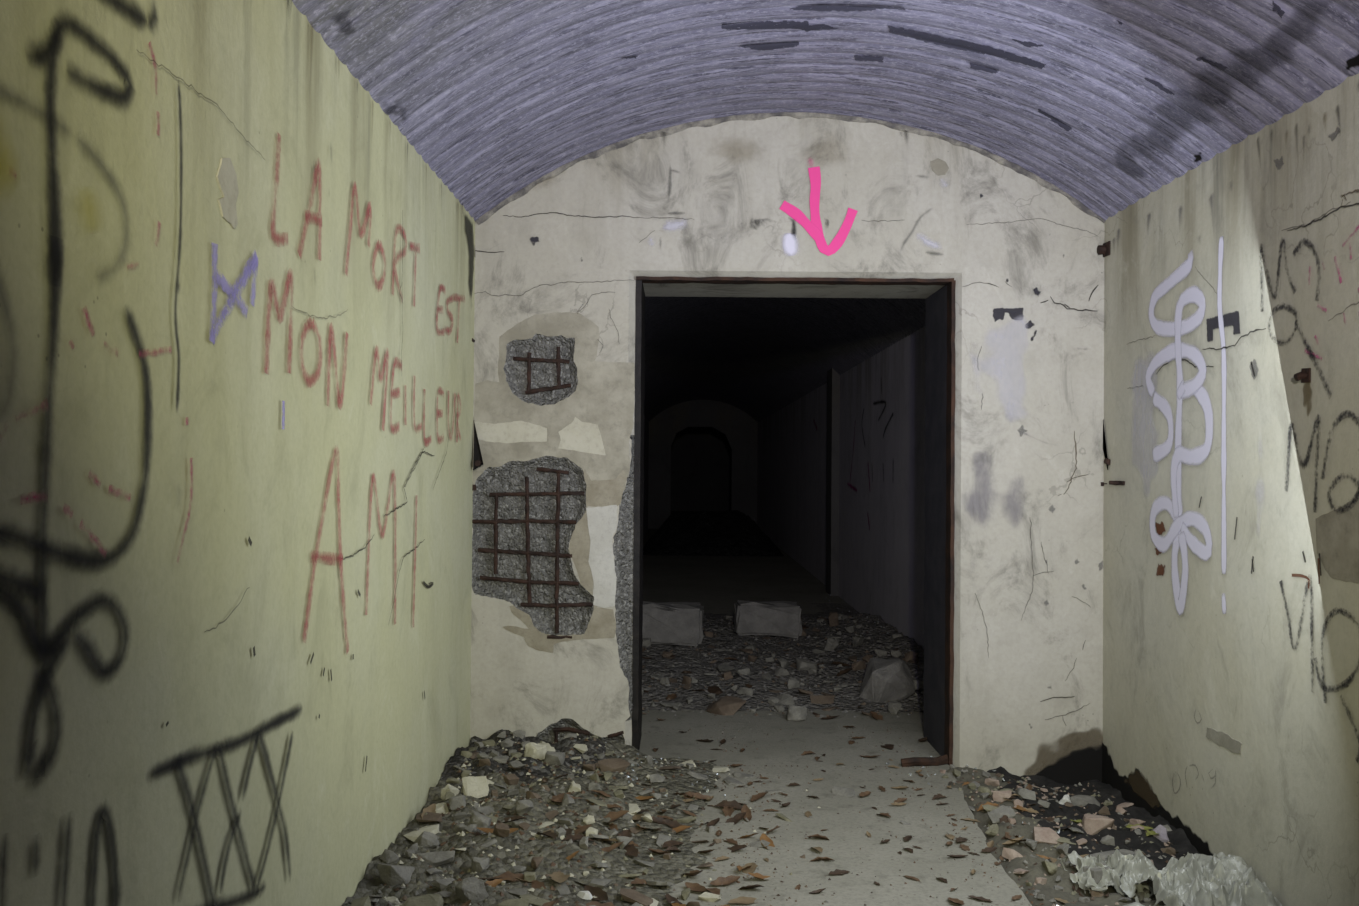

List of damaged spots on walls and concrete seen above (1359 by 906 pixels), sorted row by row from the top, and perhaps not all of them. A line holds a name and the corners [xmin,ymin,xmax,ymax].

crack [1284,189,1359,231]
rust [1303,382,1311,414]
spalling [472,312,635,744]
flaking render [1316,497,1359,583]